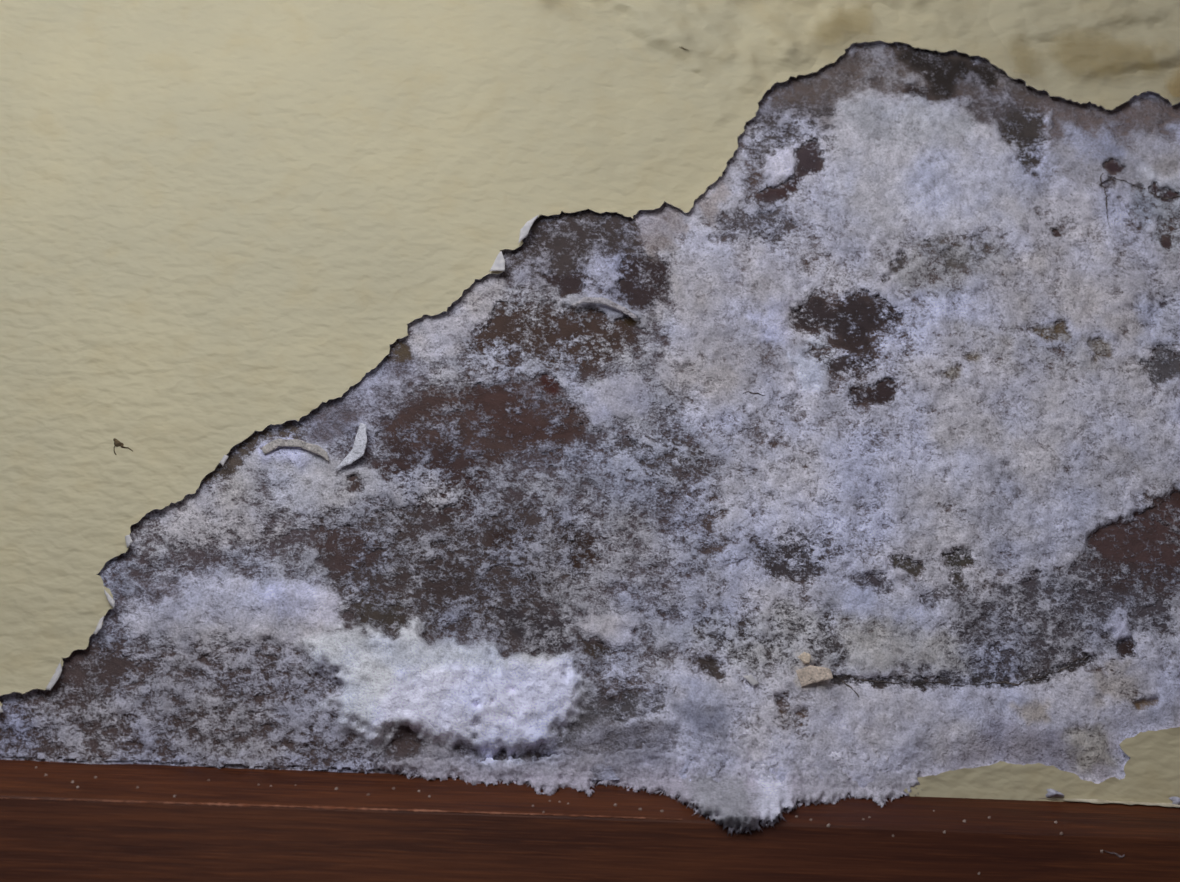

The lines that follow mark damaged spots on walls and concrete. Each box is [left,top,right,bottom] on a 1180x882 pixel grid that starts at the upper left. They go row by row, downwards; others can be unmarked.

peeling [719,120,825,245]
damp [691,41,1058,311]
damp [889,44,1180,349]
peeling [793,259,905,405]
peeling [116,513,221,584]
peeling [0,589,422,774]
peeling [201,289,656,654]
damp [0,202,921,835]
damp [352,238,1180,788]
peeling [763,541,827,581]
peeling [796,652,849,687]
peeling [860,491,1180,691]